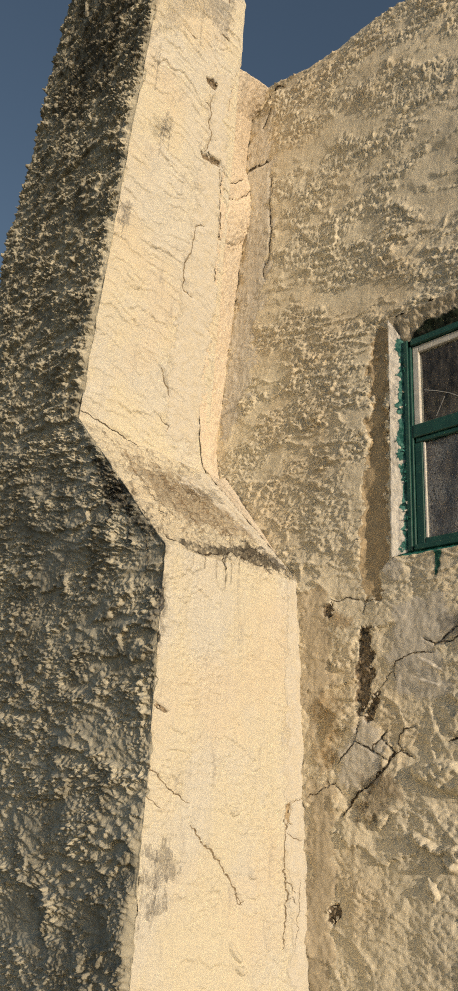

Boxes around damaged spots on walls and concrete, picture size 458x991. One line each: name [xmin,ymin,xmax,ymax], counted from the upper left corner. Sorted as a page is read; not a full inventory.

crack [182,224,205,297]
crack [382,626,458,686]
crack [282,722,416,950]